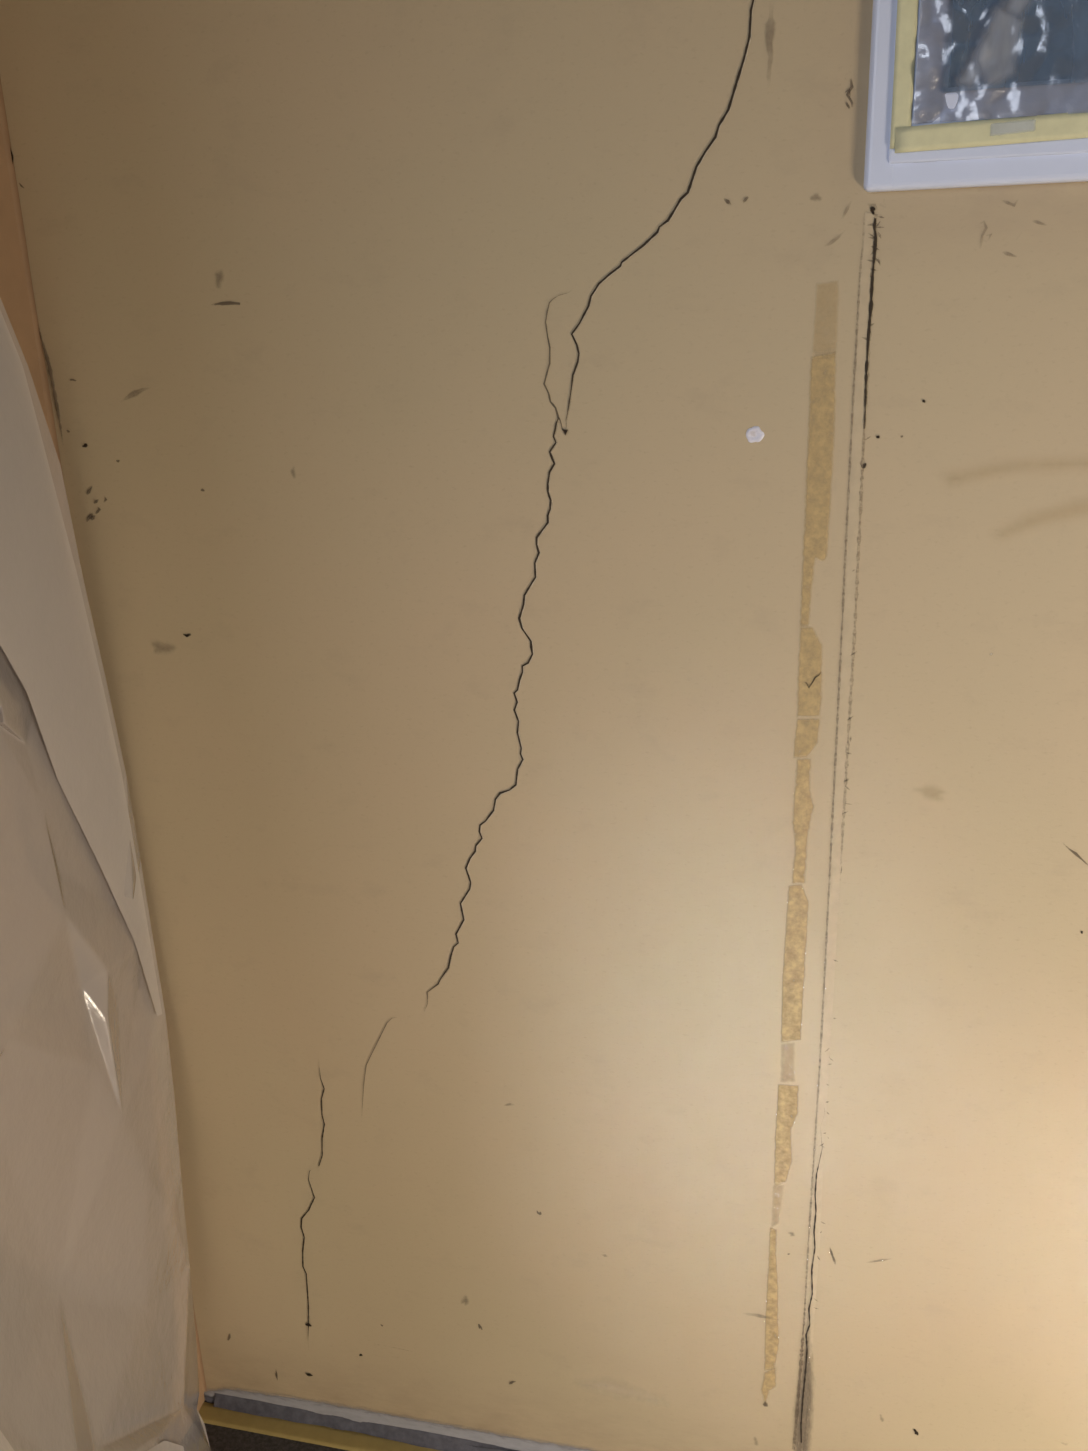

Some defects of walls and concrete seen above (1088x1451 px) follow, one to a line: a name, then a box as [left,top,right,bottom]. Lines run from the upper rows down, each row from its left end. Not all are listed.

crack [860,216,882,469]
crack [426,0,756,1006]
crack [362,1018,392,1106]
crack [300,1068,325,1333]
crack [800,1101,829,1443]